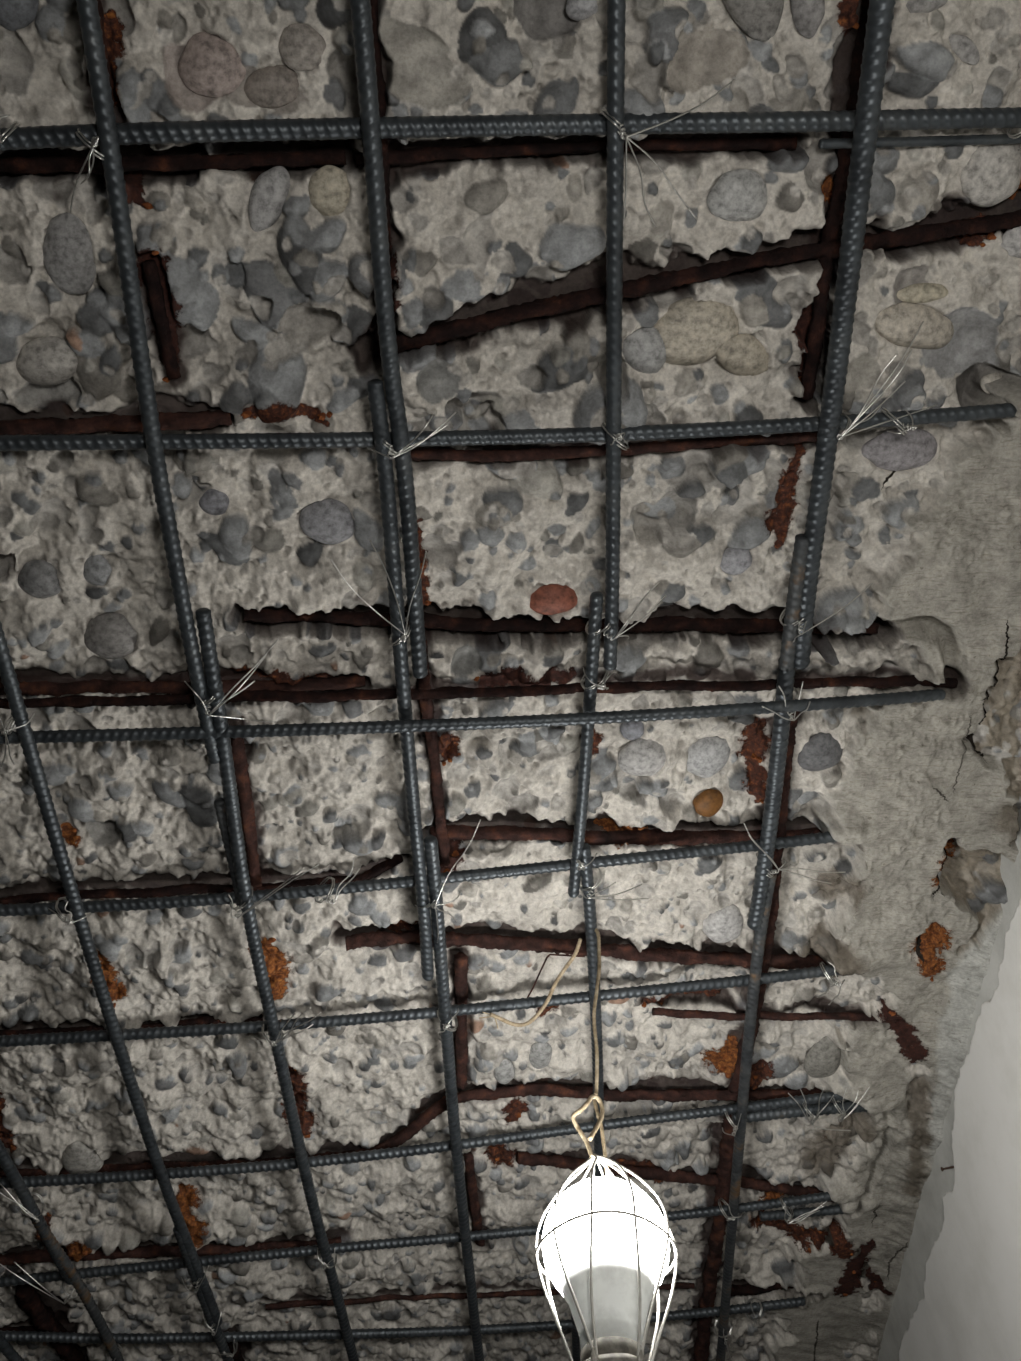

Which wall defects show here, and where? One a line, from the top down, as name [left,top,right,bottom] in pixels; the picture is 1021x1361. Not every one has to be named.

spalling [101,0,360,123]
spalling [378,0,607,117]
spalling [624,0,862,116]
spalling [866,128,1021,234]
rust [411,431,818,549]
spalling [771,229,1021,957]
rust [793,675,958,689]
spalling [0,131,902,1361]
rust [930,838,956,887]
rust [0,518,930,1361]
rust [909,922,952,982]
peeling [899,649,1021,1361]